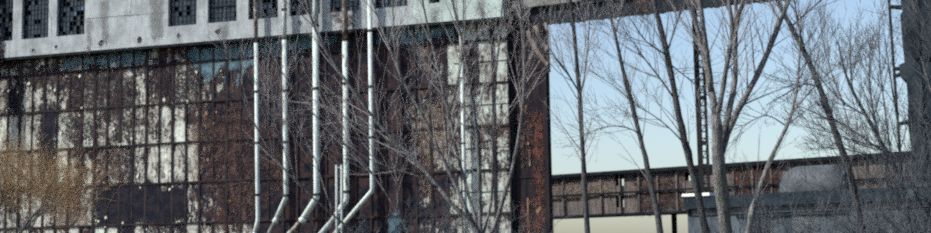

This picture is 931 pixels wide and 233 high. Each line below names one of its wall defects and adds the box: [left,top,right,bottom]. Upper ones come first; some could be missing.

leakage [60,49,150,74]
corrosion [187,102,281,233]
corrosion [465,71,613,233]